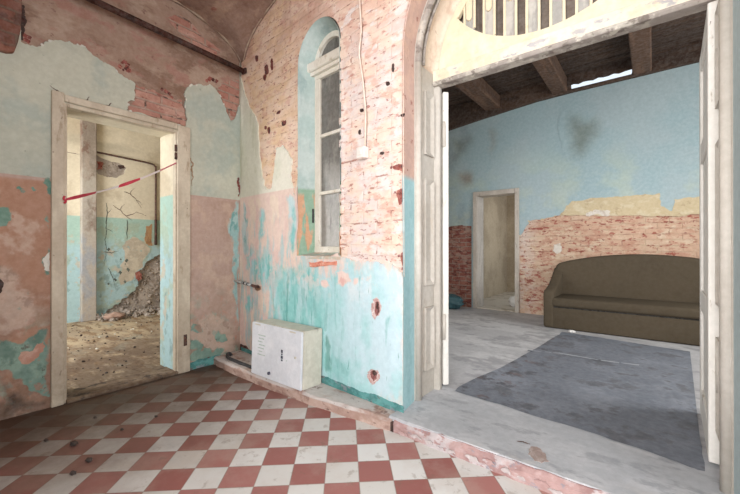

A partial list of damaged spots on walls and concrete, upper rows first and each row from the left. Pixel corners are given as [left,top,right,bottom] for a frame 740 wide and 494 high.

water stain [558,106,610,166]
peeling [0,205,14,229]
peeling [13,176,51,230]
crack [104,192,146,285]
spalling [21,0,411,405]
spalling [449,225,472,307]
spalling [519,193,700,315]
peeling [0,262,50,397]